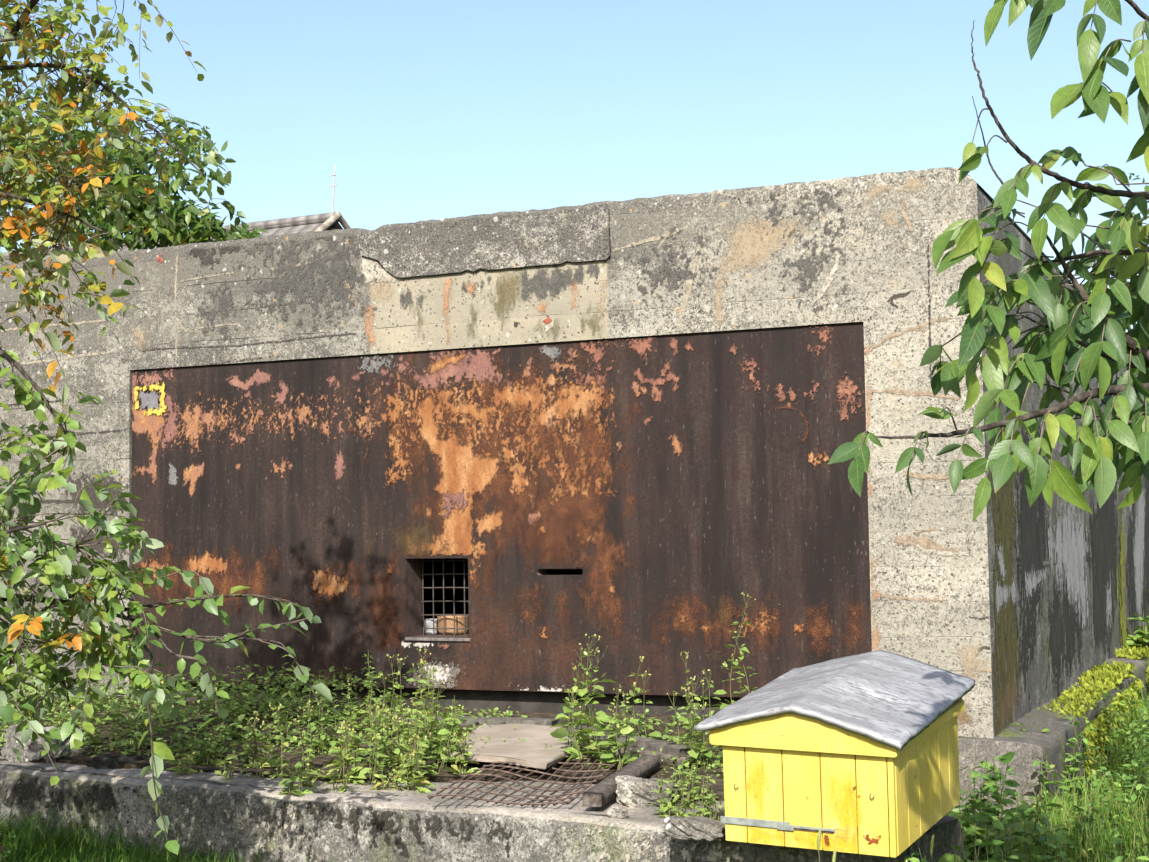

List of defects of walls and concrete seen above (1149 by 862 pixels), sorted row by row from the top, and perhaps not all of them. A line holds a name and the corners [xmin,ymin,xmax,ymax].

water stain [194,233,384,351]
spalling [360,256,397,284]
rust [134,361,633,638]
rust [654,562,879,651]
water stain [989,406,1149,736]
water stain [273,801,527,857]